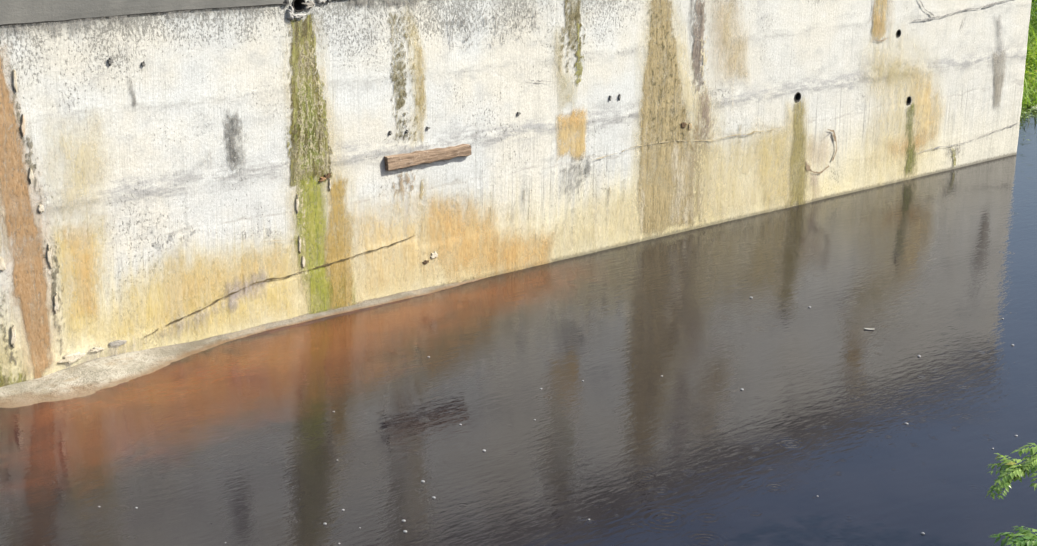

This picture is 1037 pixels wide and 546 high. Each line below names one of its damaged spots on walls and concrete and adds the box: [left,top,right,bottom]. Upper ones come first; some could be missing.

corrosion [0,57,53,379]
damp [13,93,42,220]
damp [112,13,355,356]
damp [390,13,406,139]
corrosion [558,111,586,158]
damp [559,0,587,85]
damp [569,0,807,246]
damp [906,104,916,175]
damp [38,241,65,347]
crack [144,235,415,337]